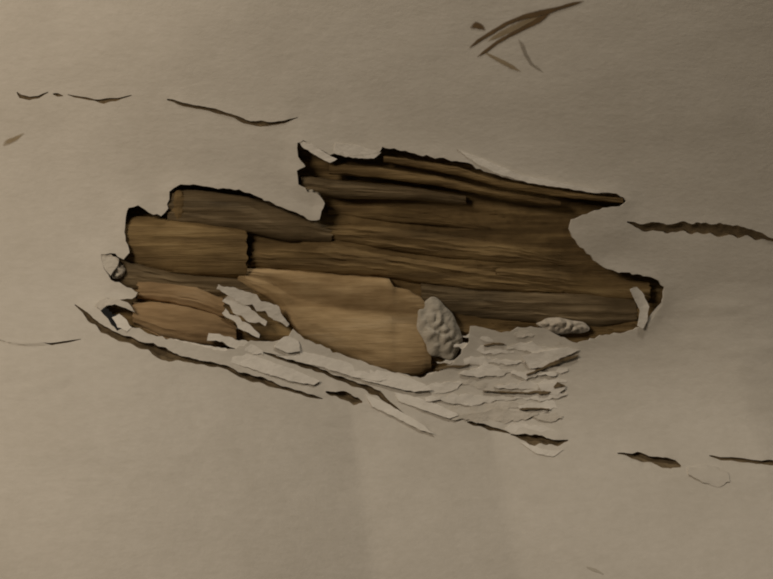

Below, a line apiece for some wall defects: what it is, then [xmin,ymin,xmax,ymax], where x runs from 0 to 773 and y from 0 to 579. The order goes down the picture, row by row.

crack [17,92,131,104]
crack [167,99,298,127]
crack [627,221,773,242]
spalling [95,141,664,436]
crack [46,338,81,346]
crack [618,452,773,487]